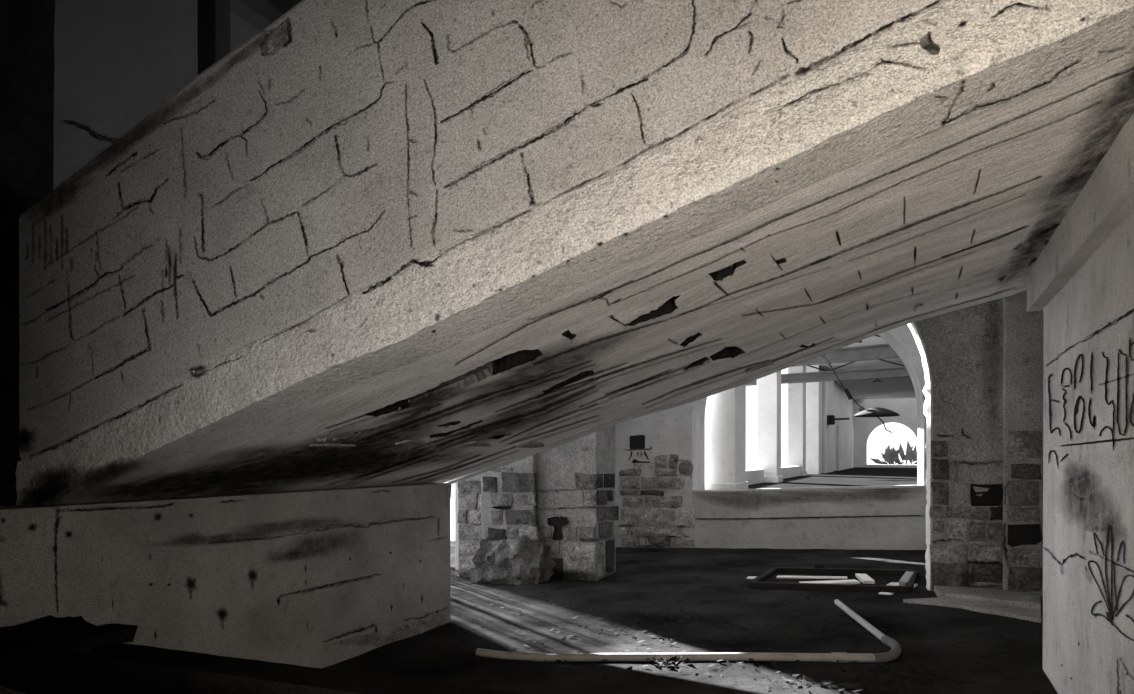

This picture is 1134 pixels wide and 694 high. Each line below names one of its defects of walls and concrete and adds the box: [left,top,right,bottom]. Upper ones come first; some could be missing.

crack [991,2,1040,18]
crack [786,42,925,105]
crack [935,50,1112,126]
crack [46,0,801,379]
spalling [709,260,747,281]
spalling [367,349,543,417]
water stain [479,341,610,397]
spalling [625,295,681,326]
spalling [680,332,703,347]
spalling [684,346,746,371]
crack [1046,308,1134,366]
water stain [21,393,455,506]